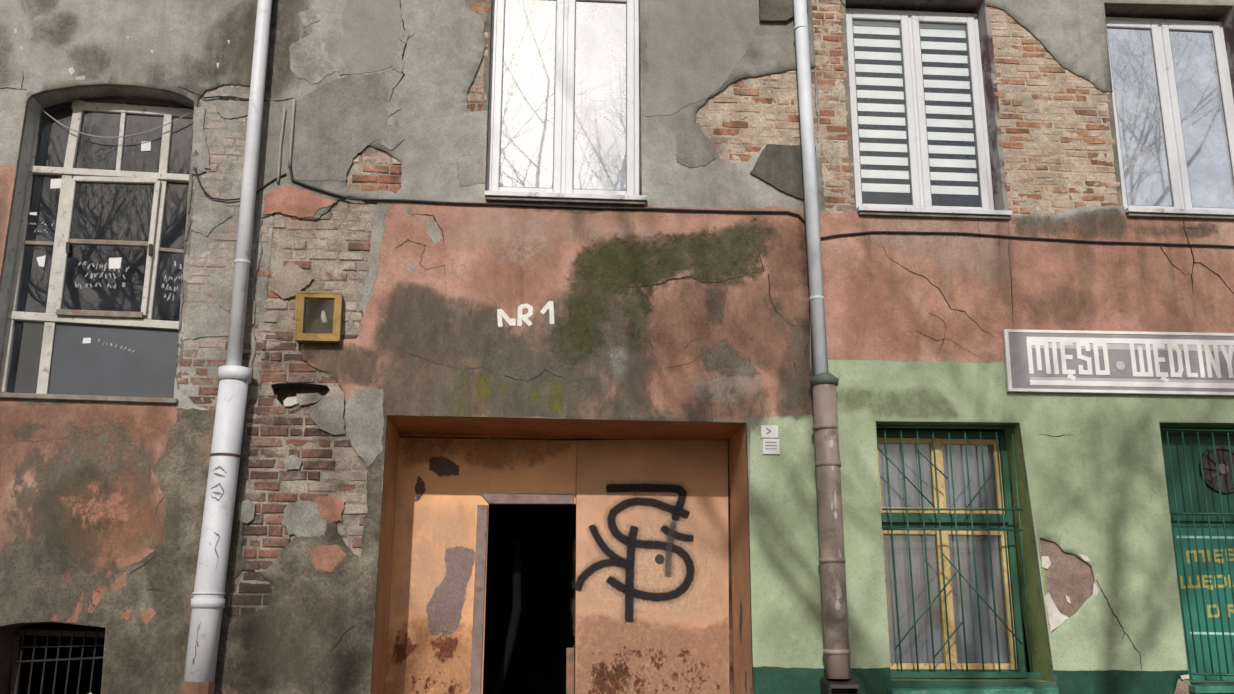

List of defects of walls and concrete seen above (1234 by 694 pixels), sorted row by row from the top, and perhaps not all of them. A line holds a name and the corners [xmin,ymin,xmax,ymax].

crack [389,0,411,101]
flaking render [695,0,856,214]
flaking render [987,6,1122,216]
flaking render [176,84,404,617]
leakage [304,224,807,428]
crack [882,246,995,358]
crack [1160,220,1234,294]
leakage [0,405,178,607]
flaking render [1040,538,1099,631]
corrosion [394,633,417,664]
corrosion [412,635,461,694]
corrosion [588,646,722,694]